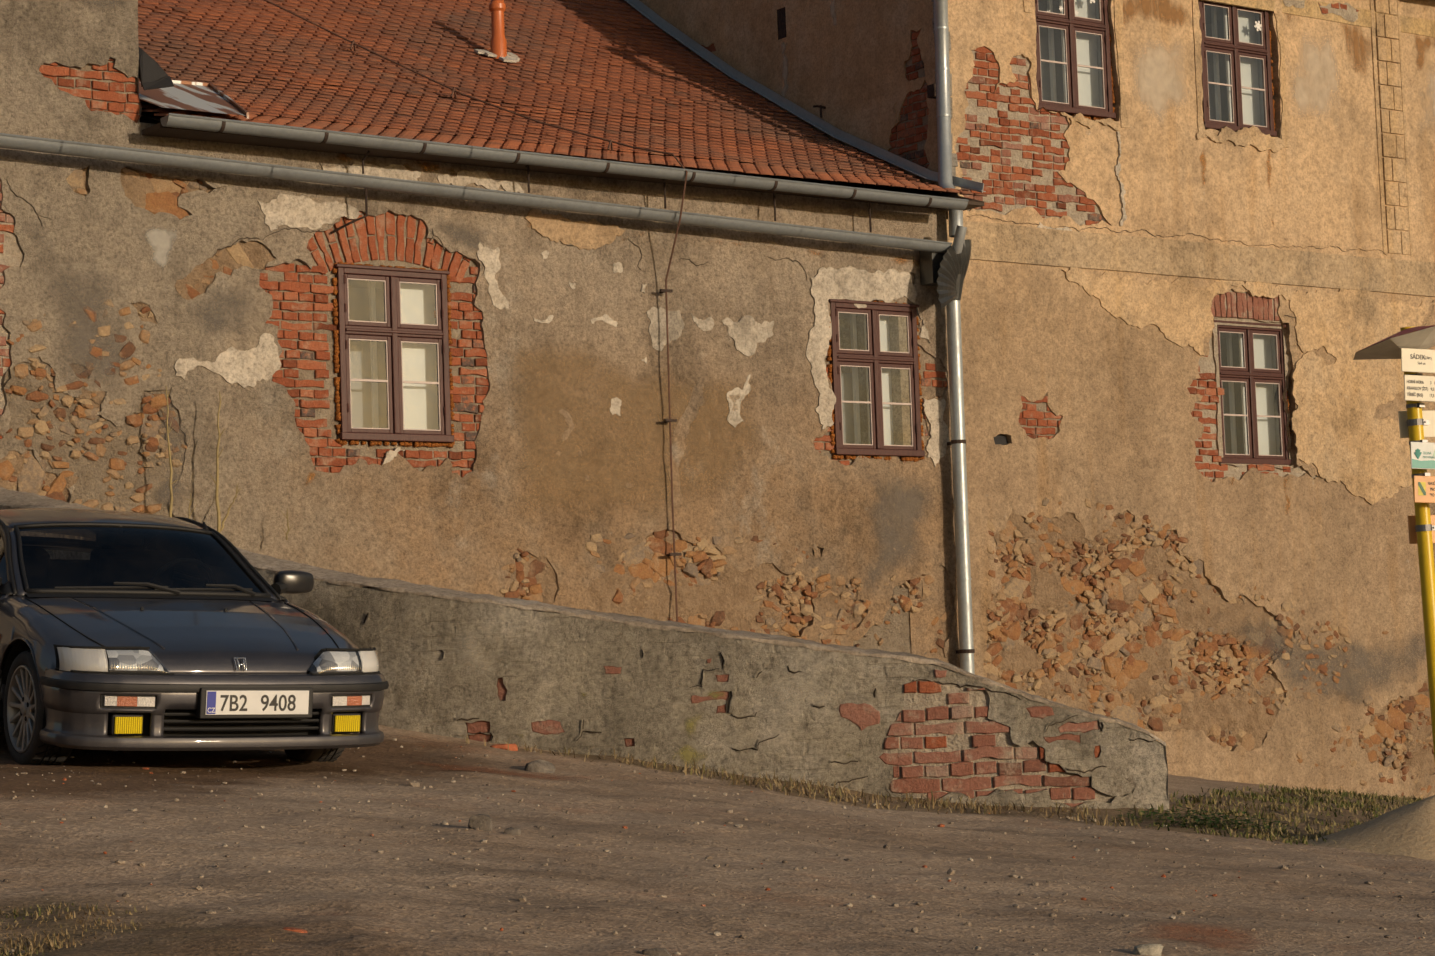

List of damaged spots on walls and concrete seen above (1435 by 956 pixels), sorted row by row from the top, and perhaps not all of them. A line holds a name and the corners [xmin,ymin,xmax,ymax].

flaking render [39,58,140,123]
flaking render [120,167,221,220]
flaking render [319,160,525,193]
flaking render [524,209,625,259]
flaking render [954,46,1127,231]
flaking render [0,181,509,517]
flaking render [641,283,774,364]
flaking render [805,265,930,466]
flaking render [921,363,949,467]
flaking render [1062,267,1435,505]
flaking render [585,497,1352,807]
flaking render [1330,679,1435,799]